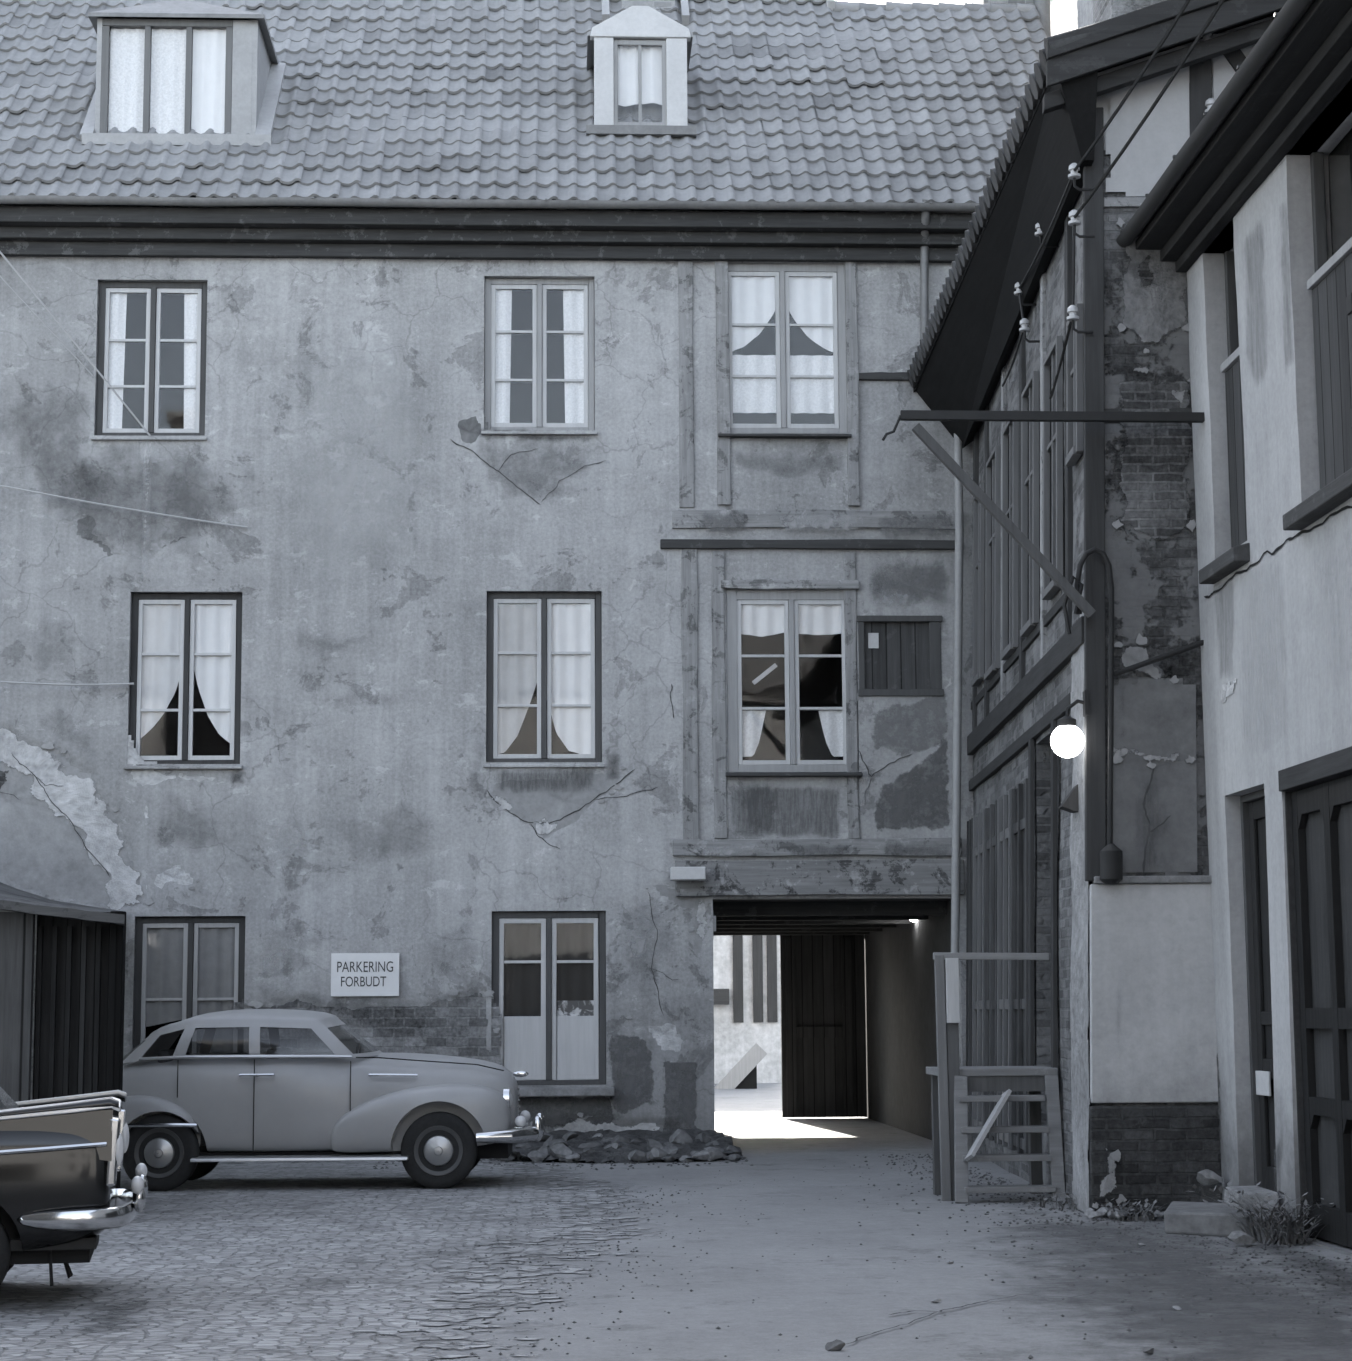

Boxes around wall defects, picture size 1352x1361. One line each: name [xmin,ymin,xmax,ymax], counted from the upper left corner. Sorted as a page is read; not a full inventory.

spalling [1112,236,1197,540]
crack [451,440,603,505]
spalling [1114,633,1179,684]
spalling [0,728,199,910]
crack [487,770,657,848]
water stain [872,696,950,853]
crack [1142,768,1170,874]
water stain [519,1036,697,1133]